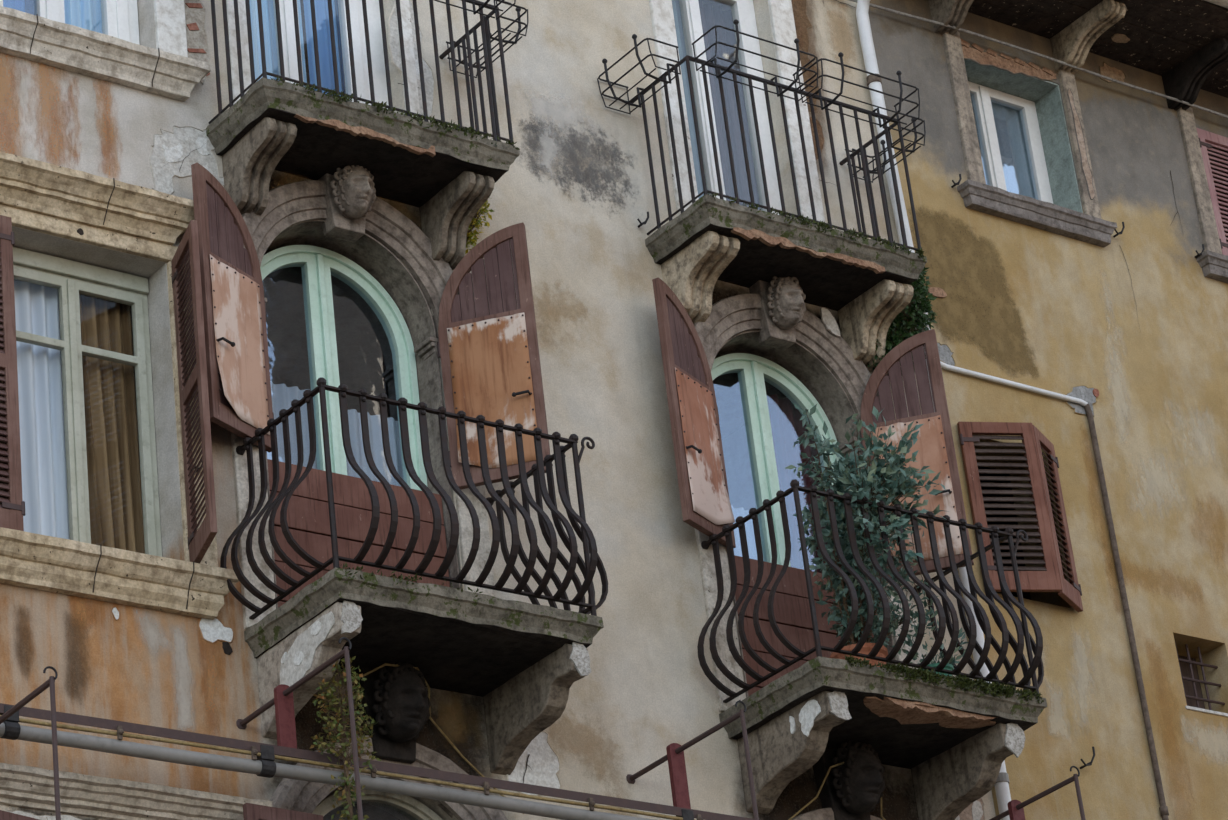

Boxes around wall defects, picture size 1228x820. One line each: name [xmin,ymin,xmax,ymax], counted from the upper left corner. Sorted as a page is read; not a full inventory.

corrosion [0,53,19,155]
corrosion [38,63,76,163]
corrosion [99,80,117,176]
peeling [149,125,224,195]
water stain [791,0,825,170]
water stain [912,210,1038,375]
water stain [18,610,31,671]
water stain [67,618,85,696]
peeling [197,618,234,644]
peeling [506,731,561,796]
peeling [789,691,852,737]
spalling [863,696,1025,758]